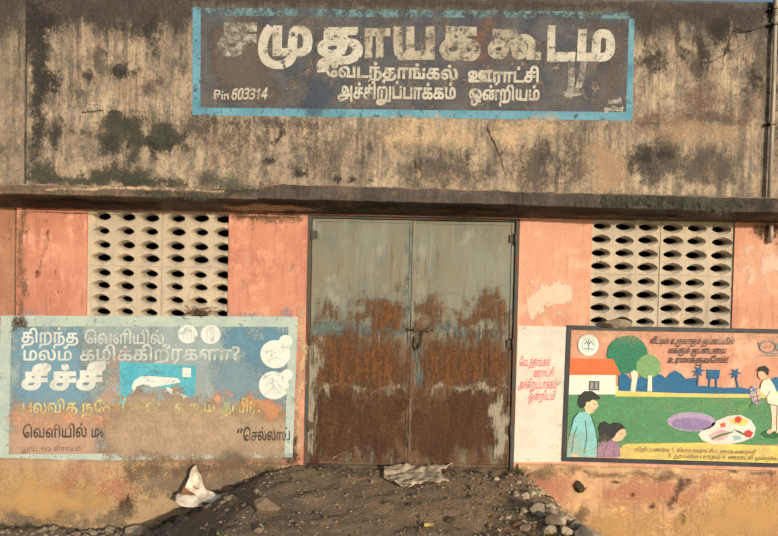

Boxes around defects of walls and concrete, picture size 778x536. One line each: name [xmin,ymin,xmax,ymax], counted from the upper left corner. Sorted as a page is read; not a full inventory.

damp [14,1,191,160]
damp [644,4,778,95]
damp [628,109,751,187]
peeling [525,279,577,321]
peeling [211,391,284,423]
corrosion [308,280,511,465]